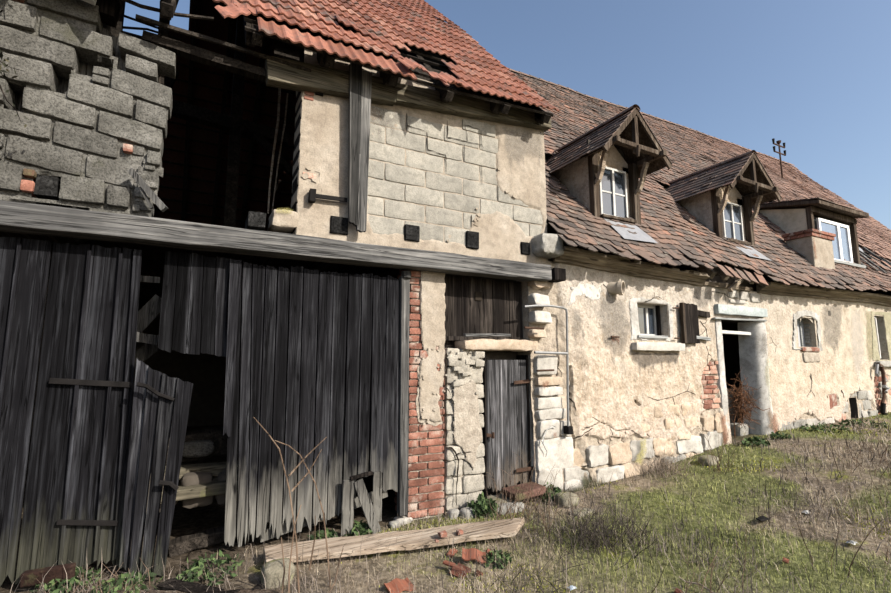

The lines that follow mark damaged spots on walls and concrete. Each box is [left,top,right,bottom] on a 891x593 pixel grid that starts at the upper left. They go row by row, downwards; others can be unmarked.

peeling [367,106,543,249]
spalling [416,347,485,426]
crack [556,364,637,441]
spalling [573,358,728,483]